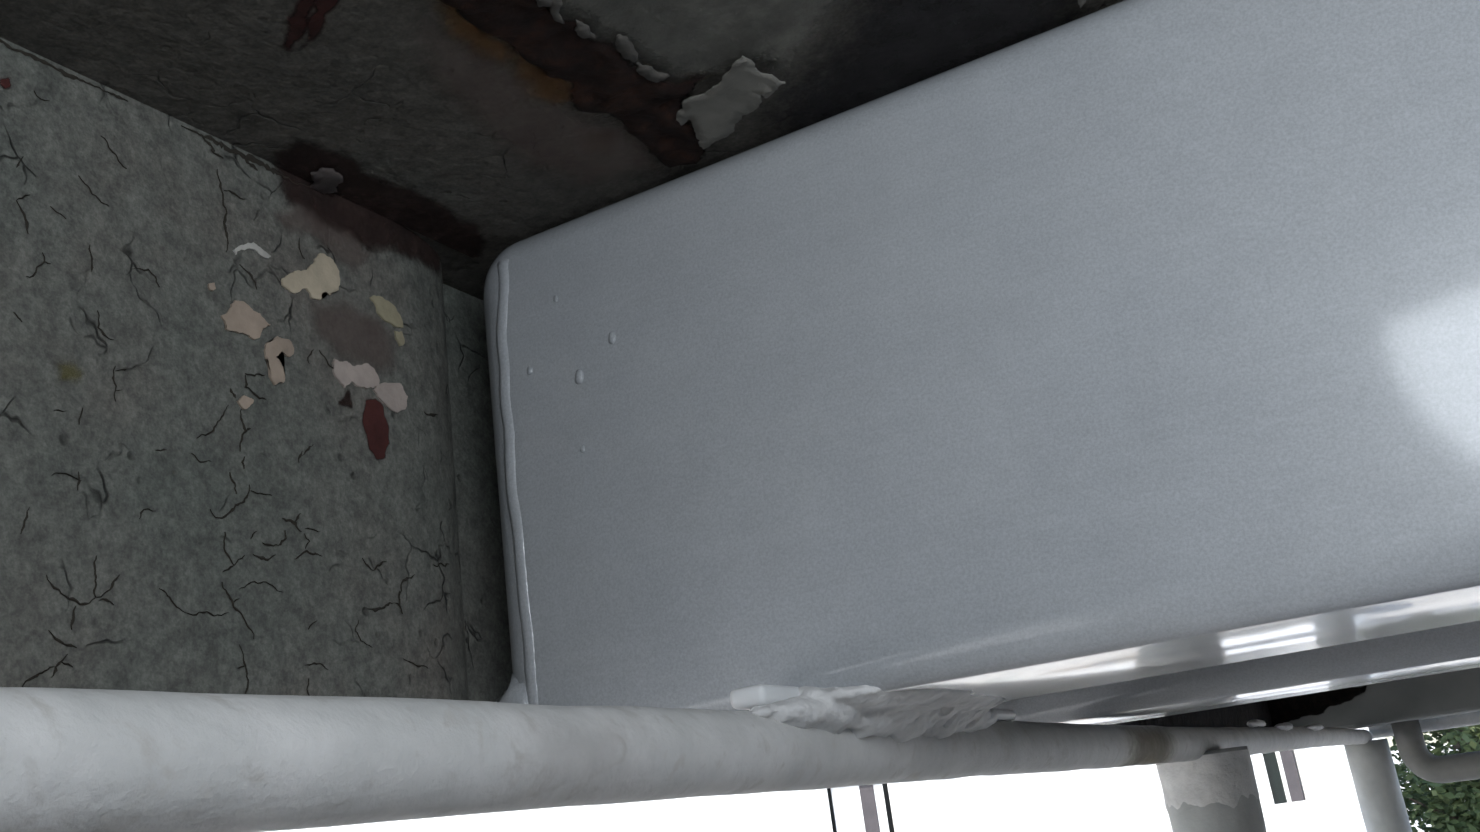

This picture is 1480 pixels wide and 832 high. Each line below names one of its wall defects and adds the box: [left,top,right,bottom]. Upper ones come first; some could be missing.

corrosion [284,0,340,51]
crack [0,39,128,102]
peeling [536,0,835,149]
crack [16,157,109,278]
peeling [232,242,271,259]
peeling [281,253,340,300]
peeling [221,300,294,386]
peeling [332,359,408,413]
peeling [369,295,405,346]
crack [156,373,321,694]
crack [22,555,119,687]
crack [355,558,448,669]